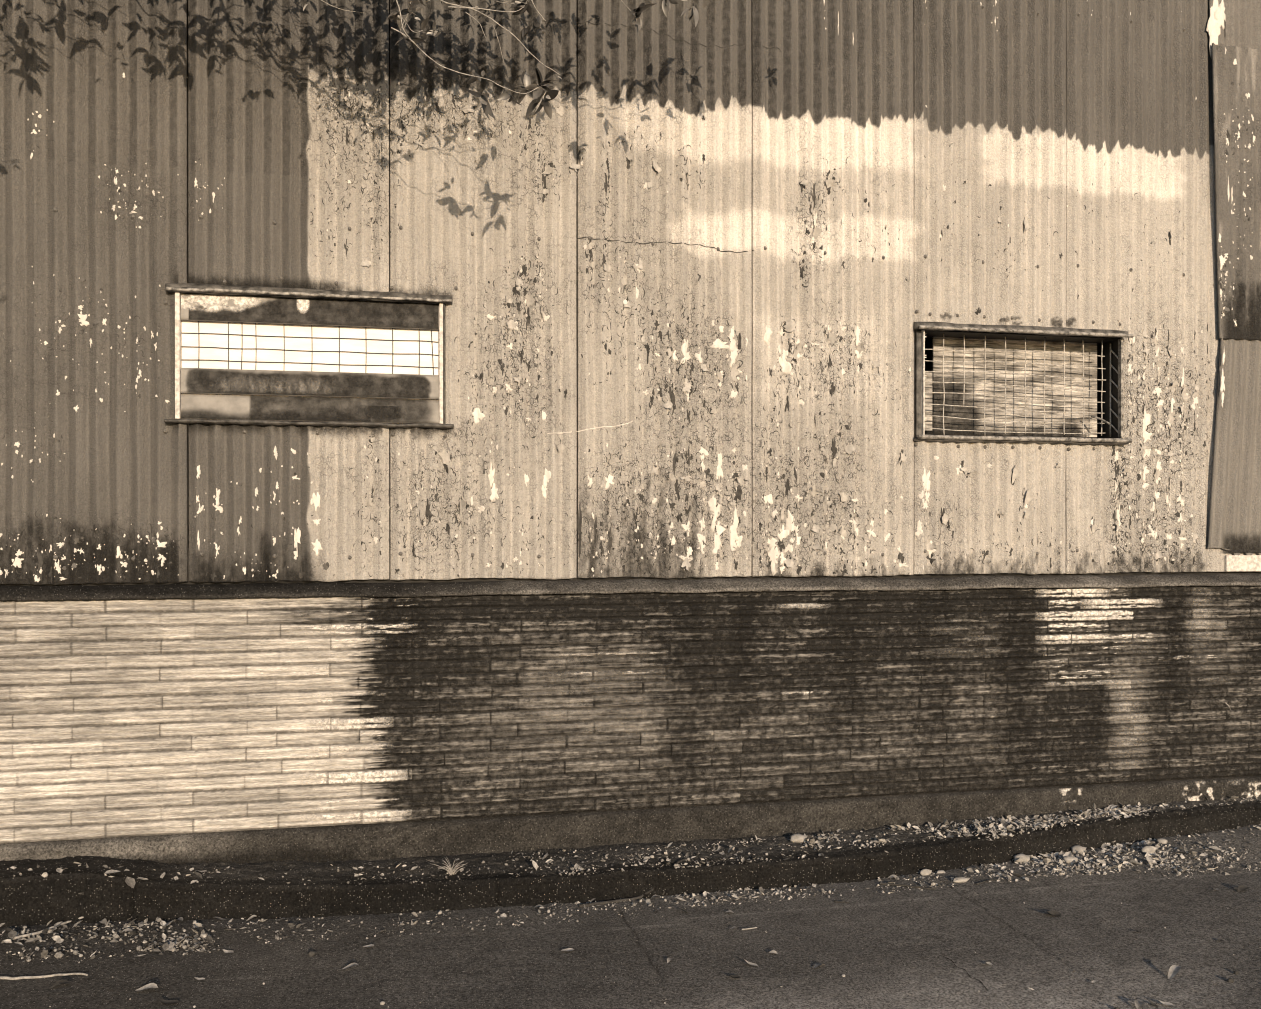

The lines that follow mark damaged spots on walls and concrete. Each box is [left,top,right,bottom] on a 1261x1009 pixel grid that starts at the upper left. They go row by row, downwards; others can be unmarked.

peeling [1206,0,1237,65]
peeling [305,56,586,267]
peeling [353,82,1256,580]
peeling [1,416,65,479]
peeling [0,511,179,586]
peeling [189,441,334,582]